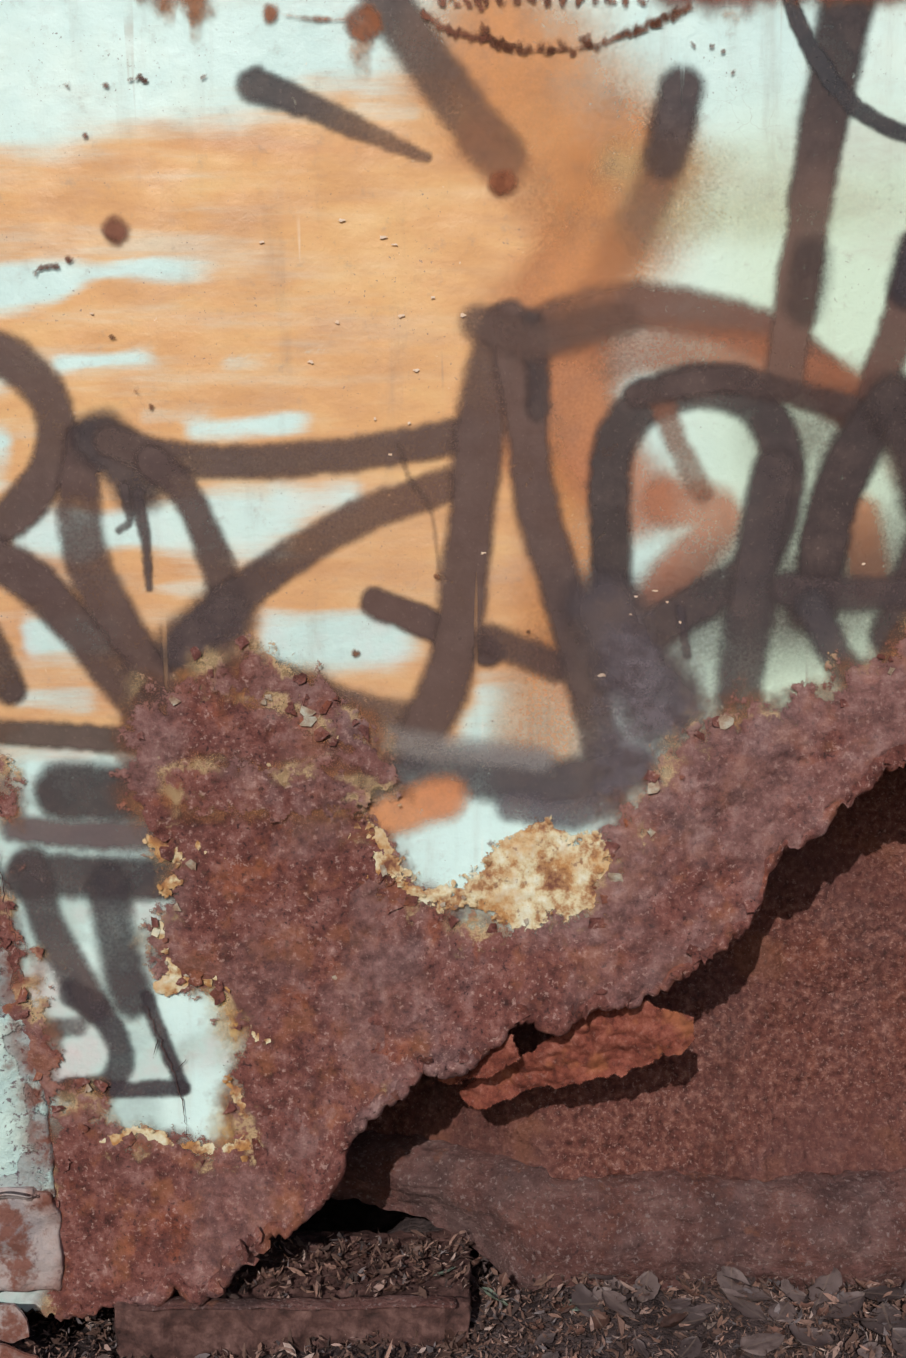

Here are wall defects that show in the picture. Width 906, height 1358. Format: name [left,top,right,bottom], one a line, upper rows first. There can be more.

peeling [348,814,613,930]
rust [0,616,906,1317]
peeling [683,944,714,978]
peeling [411,1054,433,1073]